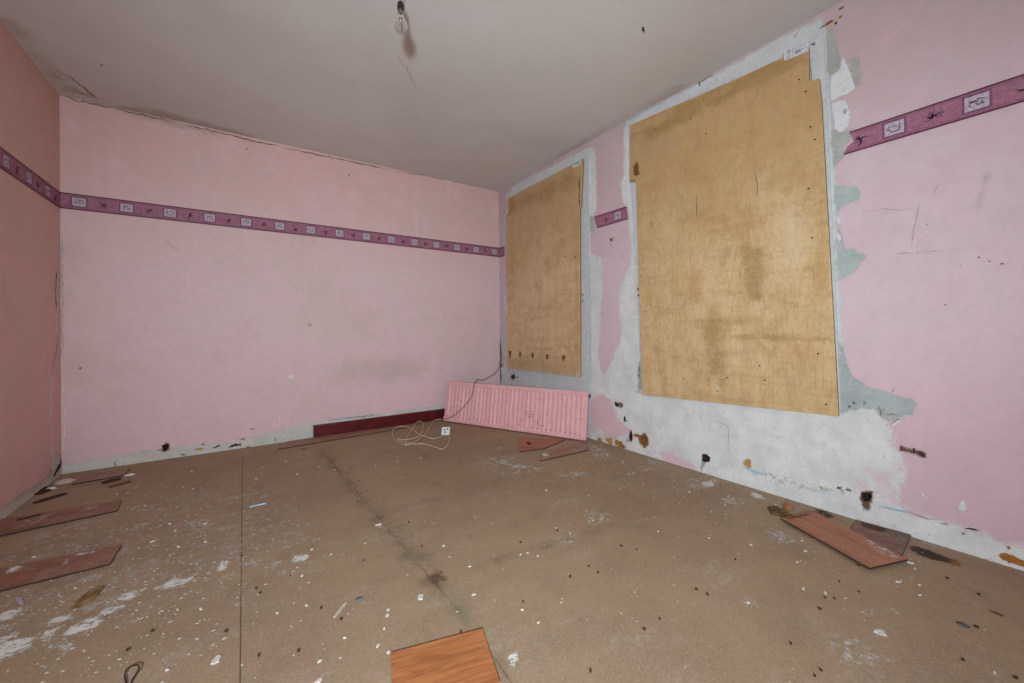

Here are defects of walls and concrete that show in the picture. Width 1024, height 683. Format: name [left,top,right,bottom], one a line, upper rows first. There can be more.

crack [50,273,61,478]
peeling [501,17,1024,571]
rust [998,545,1024,567]